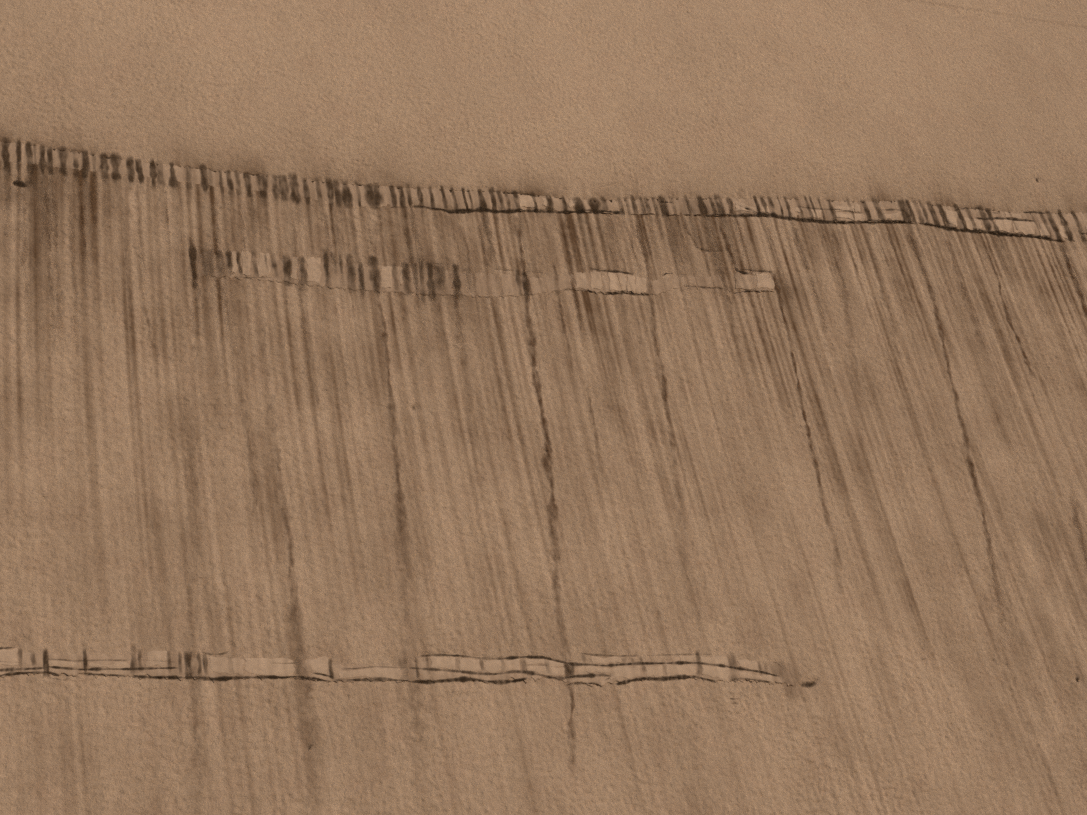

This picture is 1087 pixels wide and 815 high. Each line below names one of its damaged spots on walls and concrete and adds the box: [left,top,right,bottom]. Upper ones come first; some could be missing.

water stain [200,165,520,212]
crack [416,194,620,214]
water stain [532,193,605,214]
water stain [686,197,734,216]
crack [708,207,1087,242]
water stain [324,254,379,287]
water stain [403,263,461,296]
crack [597,269,670,295]
crack [701,268,771,293]
water stain [1041,210,1087,316]
water stain [530,338,555,507]
crack [0,647,777,699]